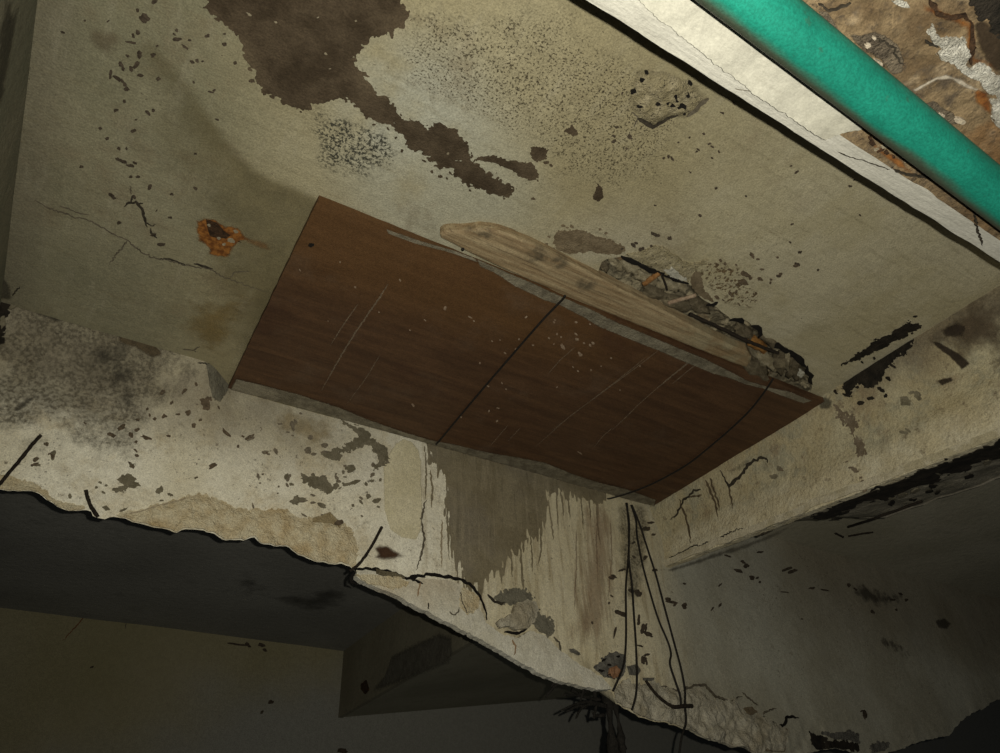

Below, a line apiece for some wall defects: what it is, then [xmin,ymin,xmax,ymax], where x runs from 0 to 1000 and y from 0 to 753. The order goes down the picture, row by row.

spalling [852,32,904,74]
spalling [968,0,1000,70]
mould [316,117,391,175]
crack [36,186,266,292]
rust [197,219,245,257]
peeling [545,224,814,391]
mould [0,308,175,430]
spalling [811,315,1000,538]
flaking render [0,362,790,753]
crack [350,500,487,620]
damp [424,443,613,609]
crack [669,456,773,558]